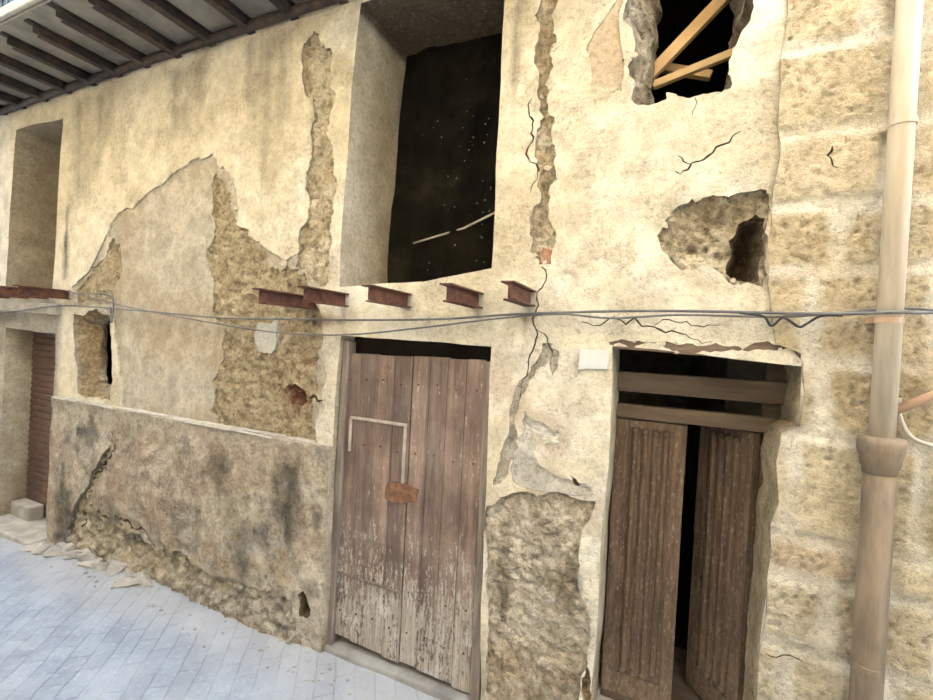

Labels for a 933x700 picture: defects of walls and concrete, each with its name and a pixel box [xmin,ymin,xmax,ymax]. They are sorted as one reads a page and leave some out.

spalling [586,0,663,106]
spalling [728,0,754,49]
crack [525,99,540,193]
flaking render [529,0,561,265]
crack [675,131,741,175]
flaking render [72,31,337,442]
flaking render [657,189,773,292]
crack [520,267,553,397]
crack [581,316,719,342]
crack [78,431,155,547]
flaking render [66,445,311,645]
flaking render [483,343,596,700]